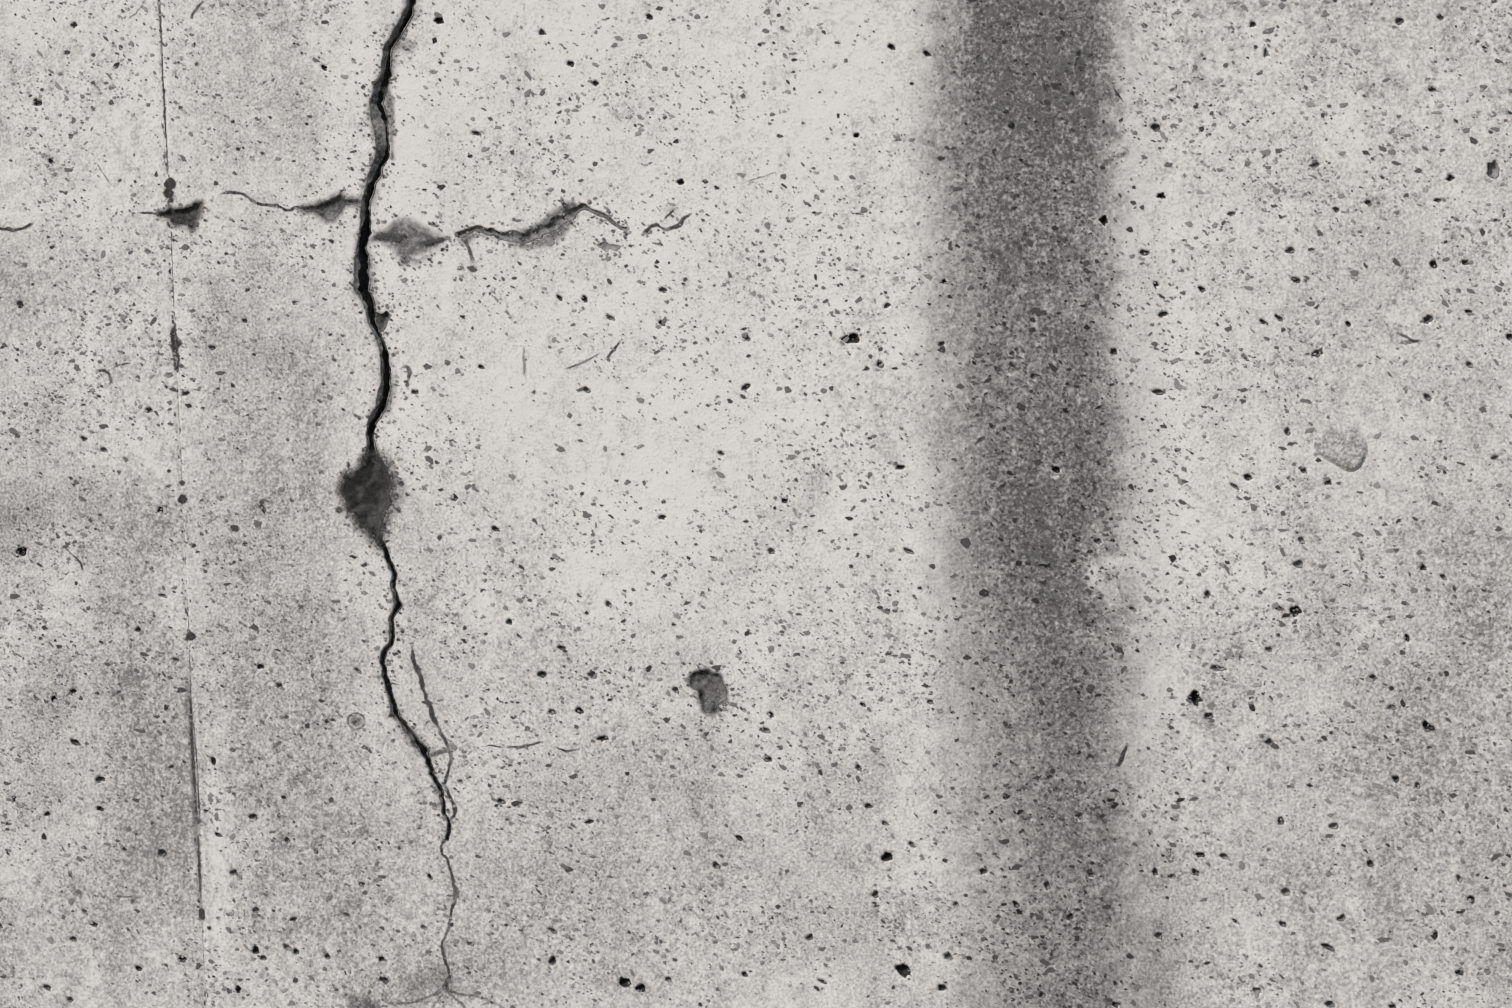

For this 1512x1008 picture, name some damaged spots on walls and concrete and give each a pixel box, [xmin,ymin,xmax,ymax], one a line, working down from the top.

crack [223,0,416,459]
crack [455,199,690,259]
damp [931,0,1132,1008]
crack [373,534,462,1004]
crack [487,741,576,753]